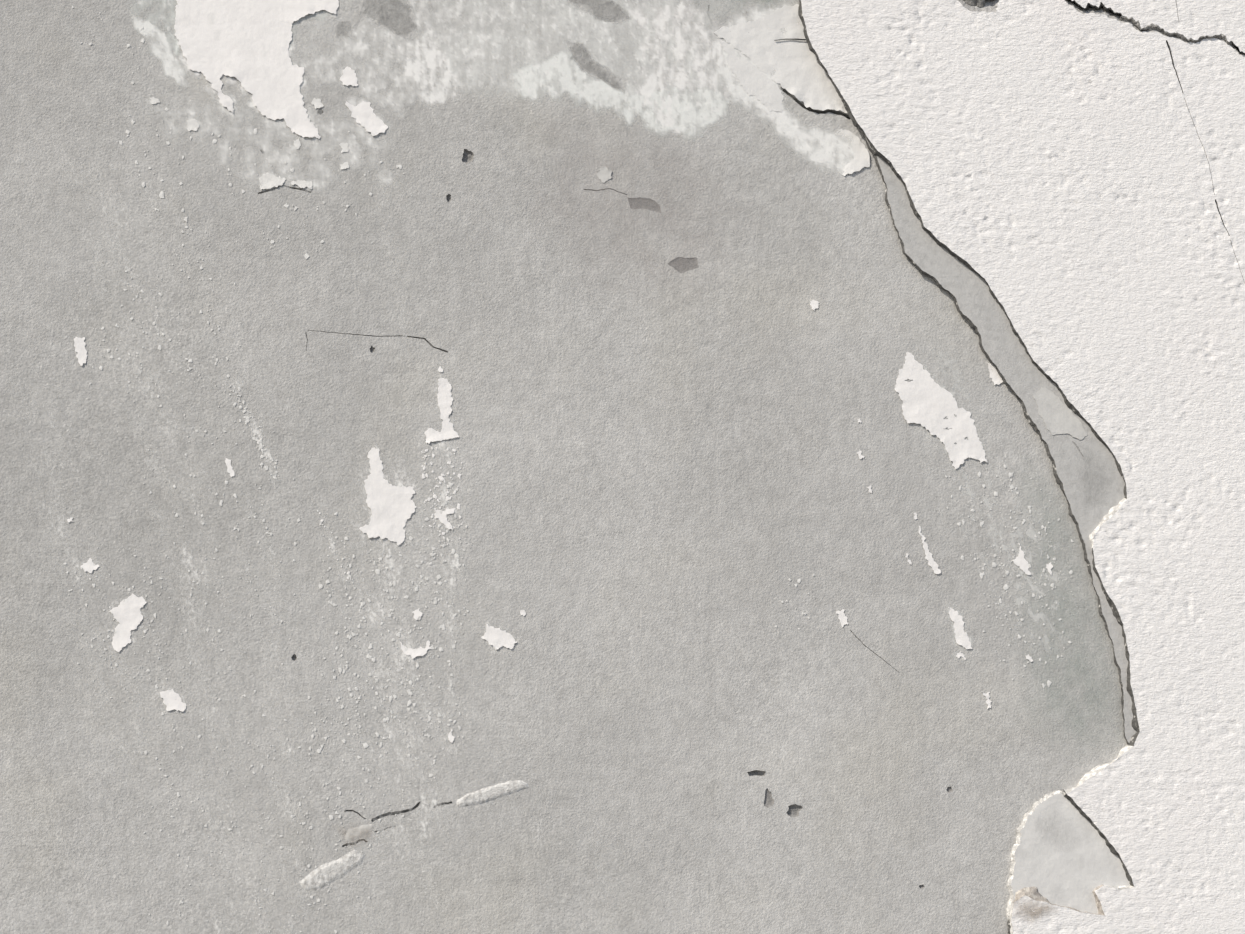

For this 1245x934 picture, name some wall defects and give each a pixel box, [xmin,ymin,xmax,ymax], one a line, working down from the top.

spalling [518,0,643,93]
peeling [345,101,388,136]
peeling [259,172,286,190]
spalling [462,149,474,164]
spalling [676,0,1140,746]
peeling [425,378,459,444]
peeling [359,447,417,546]
peeling [110,593,147,652]
peeling [481,624,517,649]
spalling [371,802,421,822]
spalling [299,850,366,891]
spalling [1064,794,1134,916]